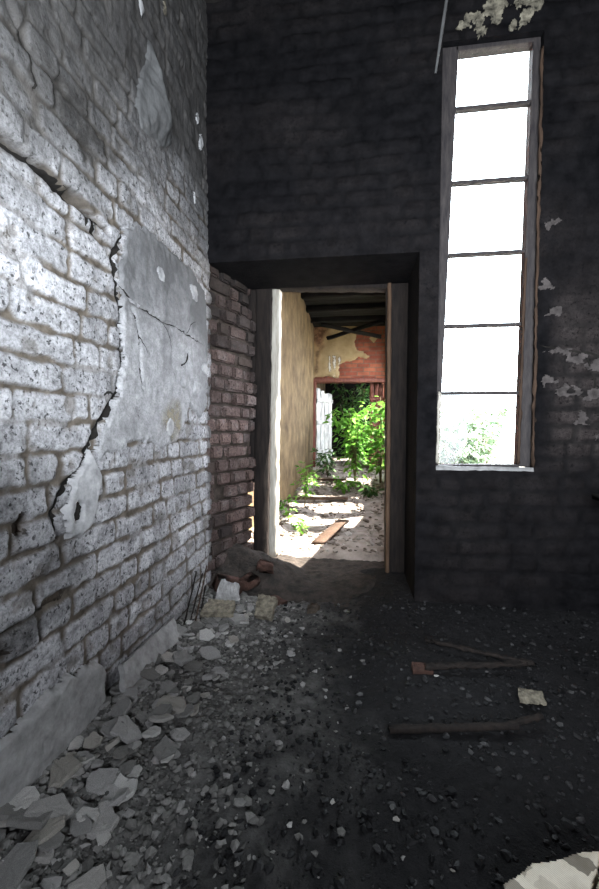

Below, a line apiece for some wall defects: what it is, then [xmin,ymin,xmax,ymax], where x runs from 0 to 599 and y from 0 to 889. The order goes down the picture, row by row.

peeling [456,0,544,39]
spalling [0,143,66,198]
crack [48,235,201,532]
peeling [314,326,369,387]
spalling [38,589,64,610]
peeling [0,660,106,807]